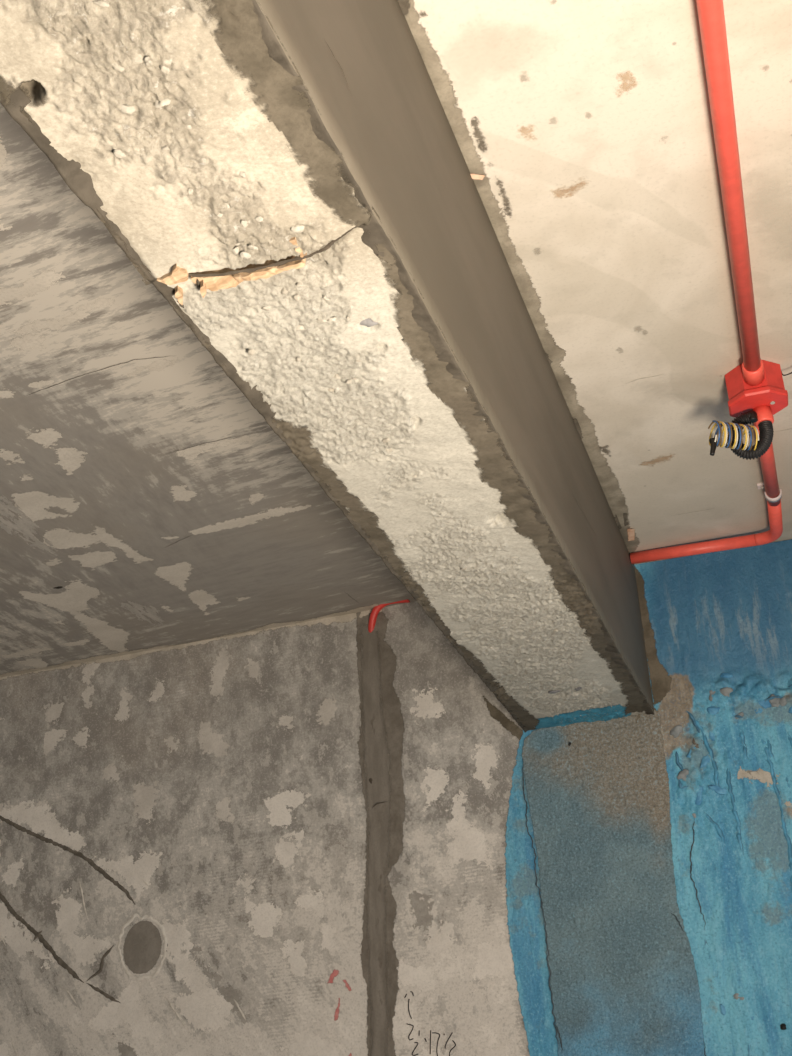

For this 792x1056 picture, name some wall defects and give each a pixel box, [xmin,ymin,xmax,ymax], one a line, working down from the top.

crack [188,228,353,288]
crack [0,815,135,904]
crack [0,892,120,1003]